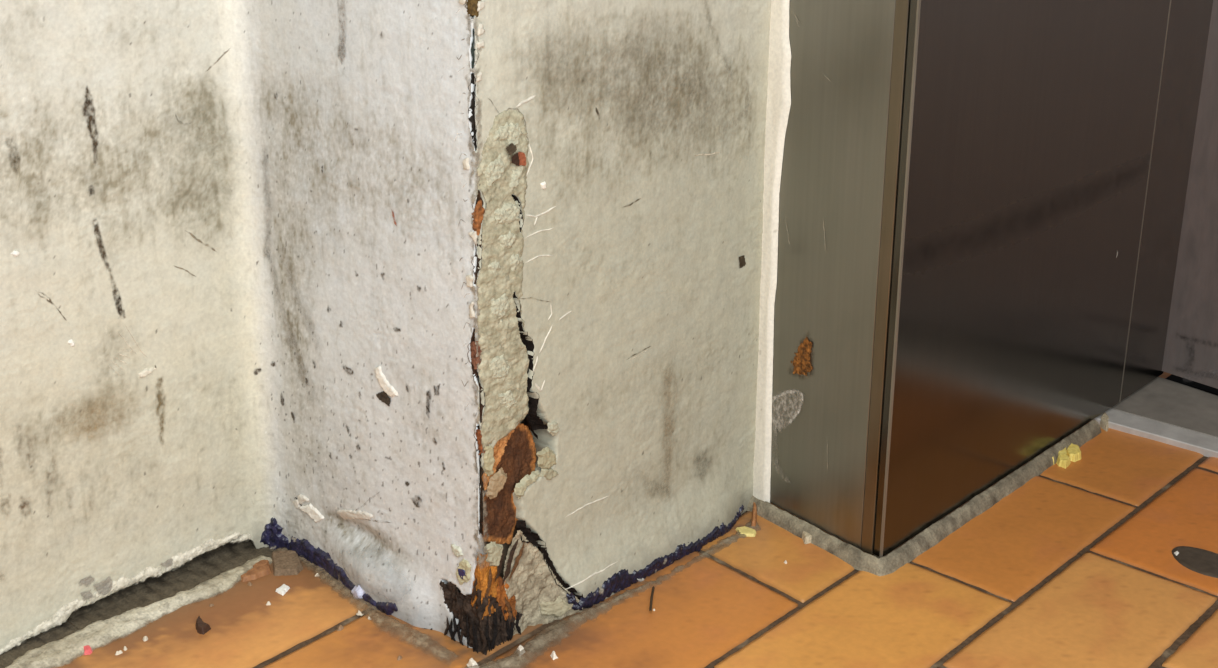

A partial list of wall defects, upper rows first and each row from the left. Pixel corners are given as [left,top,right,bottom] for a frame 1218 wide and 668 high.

crack [512,195,524,232]
spalling [440,0,618,655]
crack [513,292,549,439]
corrosion [790,337,813,376]
flaking render [0,532,287,668]
crack [515,520,584,610]